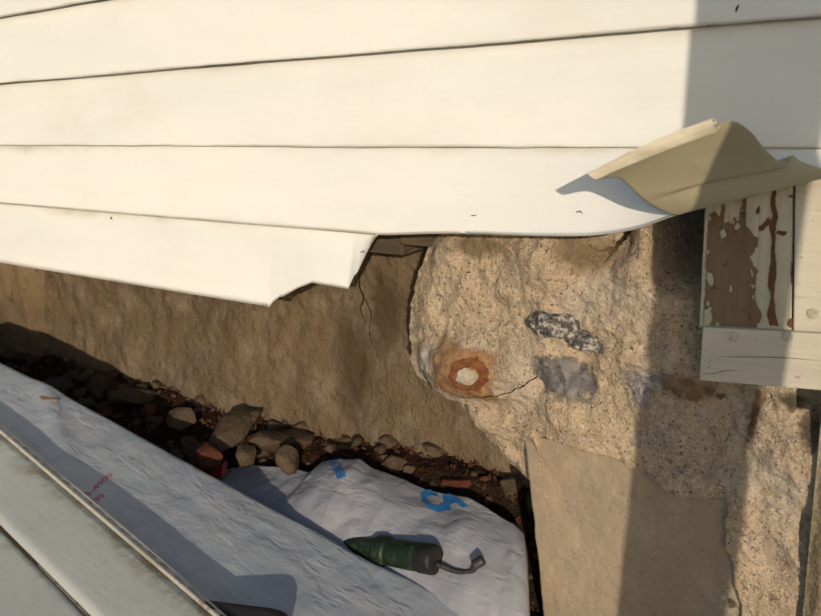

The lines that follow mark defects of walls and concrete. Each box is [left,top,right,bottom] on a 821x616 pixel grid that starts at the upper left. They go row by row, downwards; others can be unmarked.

peeling [703,190,794,328]
crack [358,270,378,359]
rust [432,339,497,401]
crack [457,371,538,398]